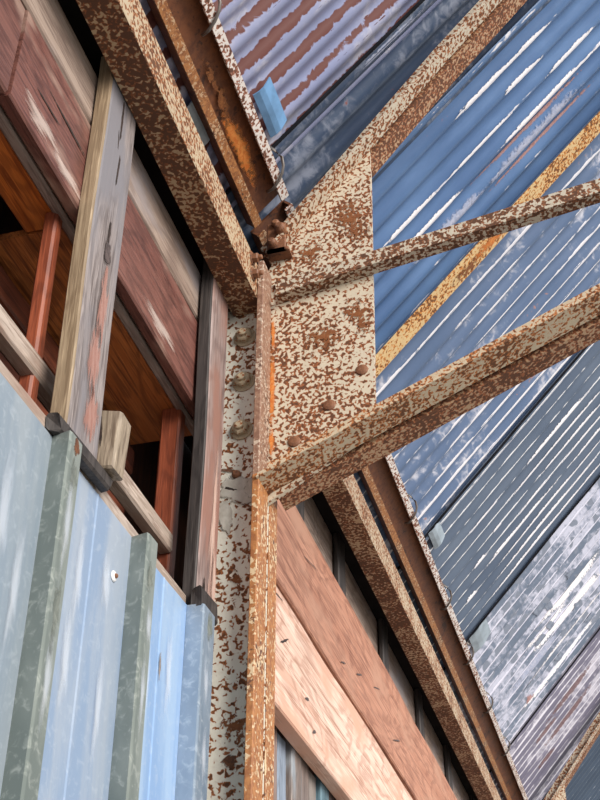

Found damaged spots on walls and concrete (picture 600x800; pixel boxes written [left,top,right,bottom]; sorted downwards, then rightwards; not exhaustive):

rust [202,60,255,185]
rust [333,197,370,248]
rust [295,238,323,271]
rust [453,234,502,286]
rust [303,297,371,359]
peeling [208,459,252,601]